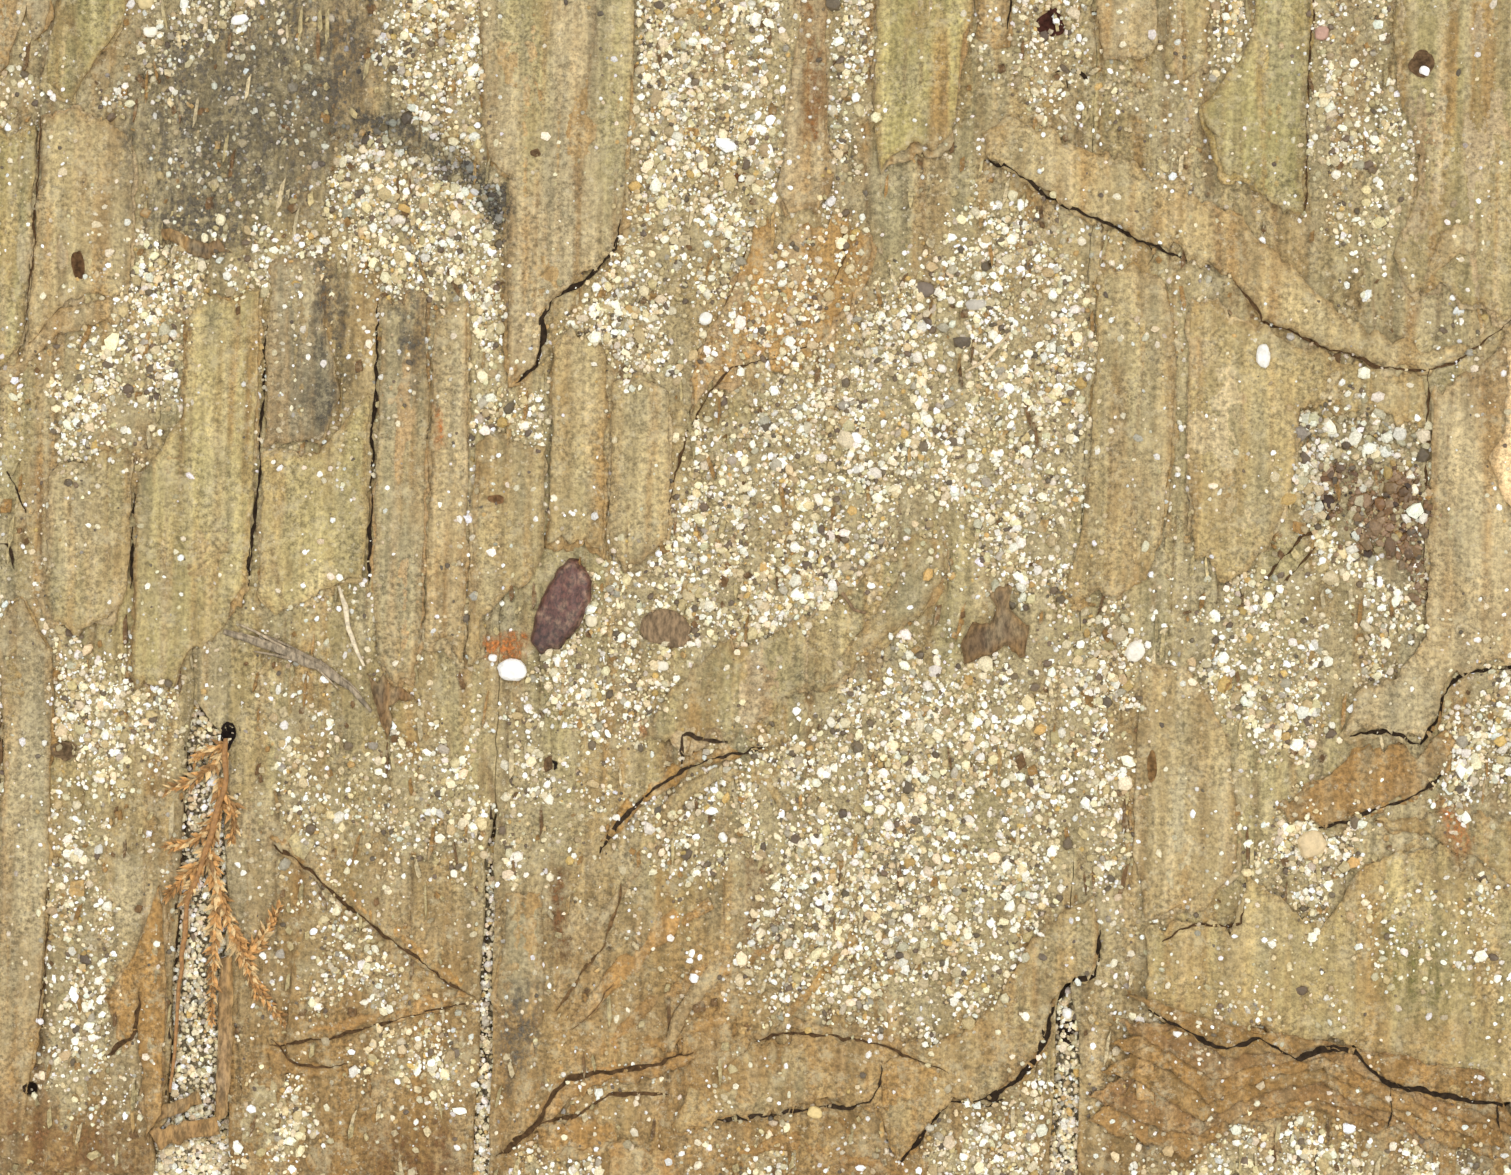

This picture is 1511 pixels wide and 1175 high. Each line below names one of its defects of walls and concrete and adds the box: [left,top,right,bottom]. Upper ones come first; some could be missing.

water stain [129,0,366,242]
water stain [354,109,510,226]
crack [984,160,1182,260]
crack [1304,0,1315,211]
crack [516,219,621,383]
crack [1234,281,1511,486]
crack [2,471,26,568]
crack [1260,532,1316,597]
spalling [792,696,805,721]
crack [1318,665,1511,829]
crack [717,930,1102,1162]